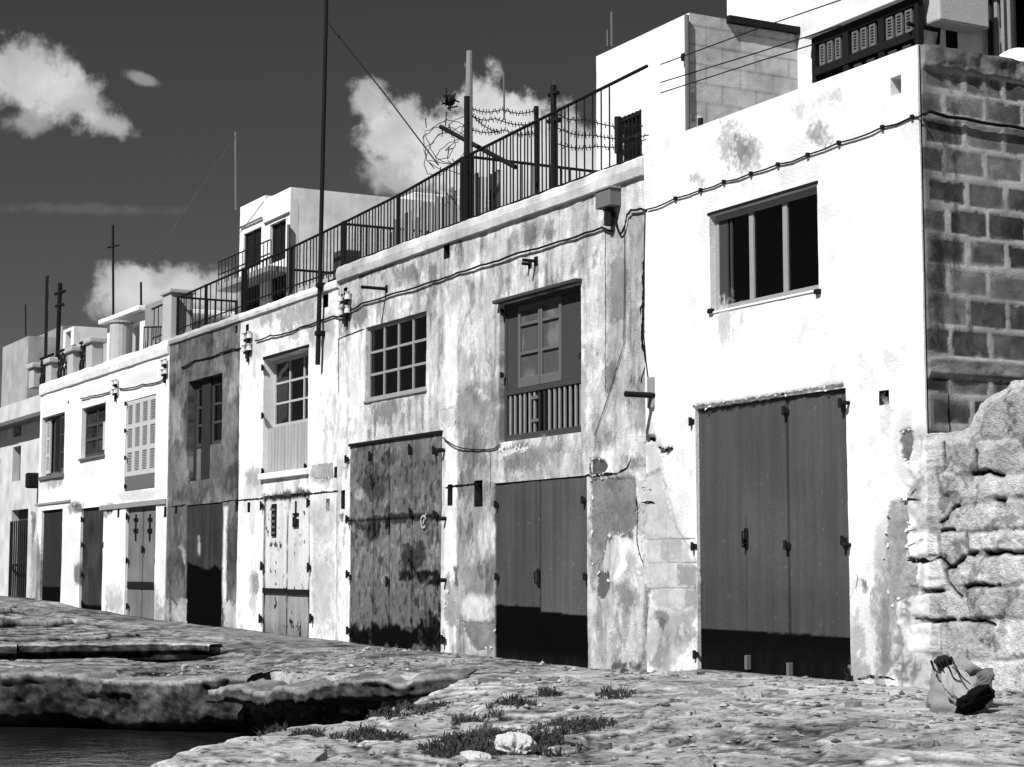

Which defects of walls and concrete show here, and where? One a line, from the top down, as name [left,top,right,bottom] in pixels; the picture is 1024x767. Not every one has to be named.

water stain [718,122,759,169]
water stain [807,120,830,147]
peeling [588,458,700,614]